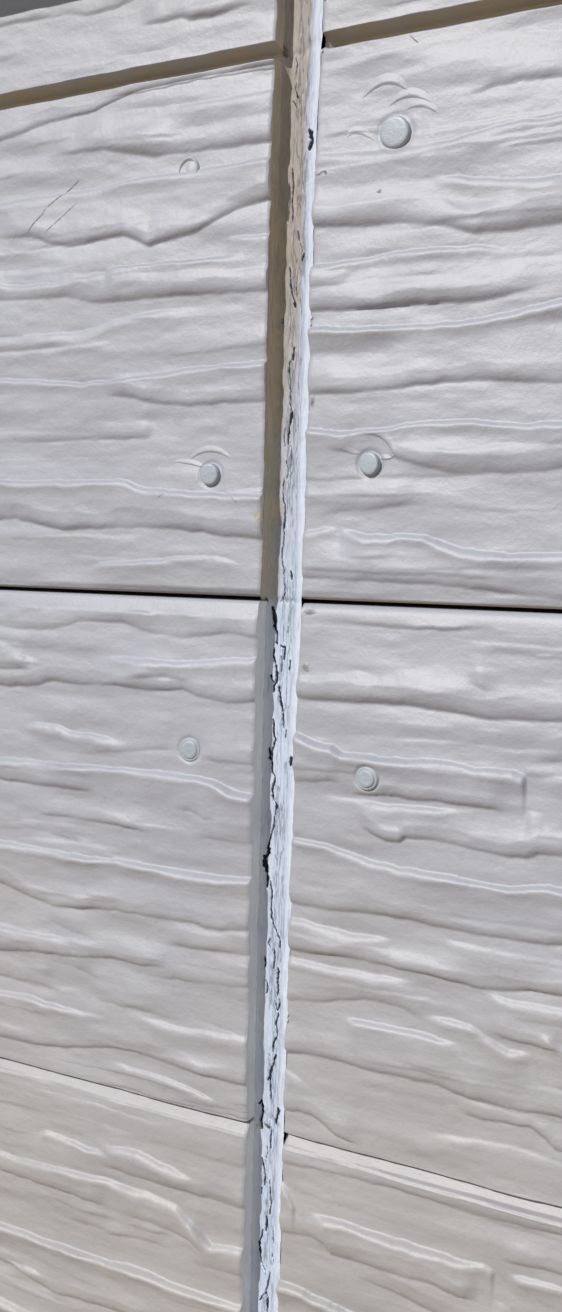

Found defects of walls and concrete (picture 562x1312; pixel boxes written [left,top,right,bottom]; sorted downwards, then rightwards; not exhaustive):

crack [289,172,303,303]
crack [259,370,293,1312]